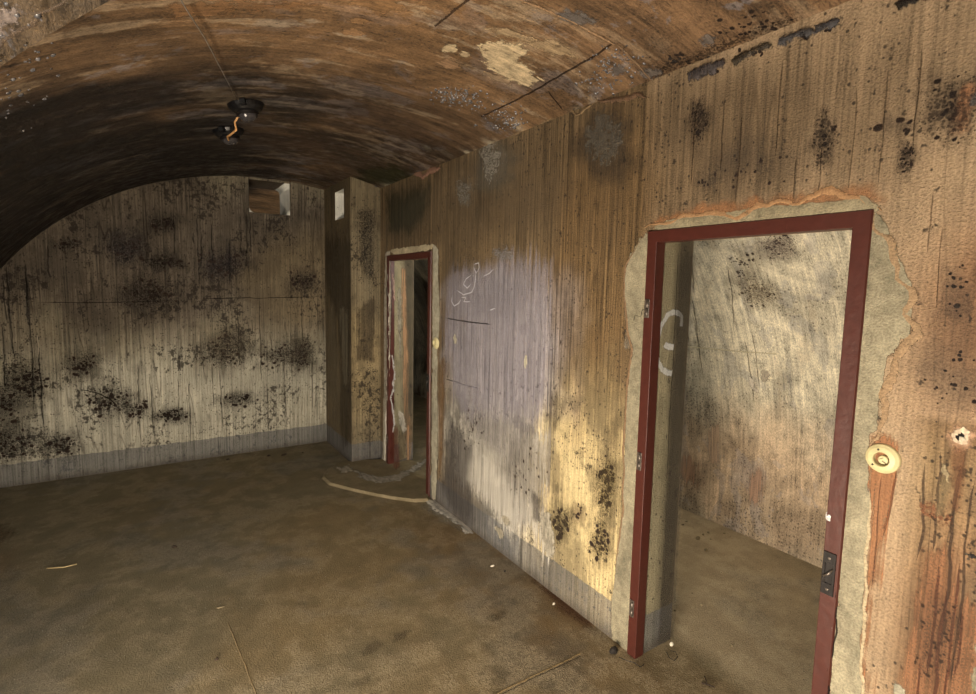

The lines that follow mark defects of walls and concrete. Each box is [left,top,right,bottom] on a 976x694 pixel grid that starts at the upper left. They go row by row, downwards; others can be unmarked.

leakage [0,0,67,48]
peeling [436,28,579,88]
leakage [896,70,976,173]
leakage [0,260,84,463]
leakage [80,369,191,439]
leakage [203,303,317,428]
leakage [357,298,374,361]
flaking render [611,185,923,694]
mould [550,503,587,541]
mould [584,455,617,562]
corrosion [864,435,898,644]
corrosion [904,546,976,694]